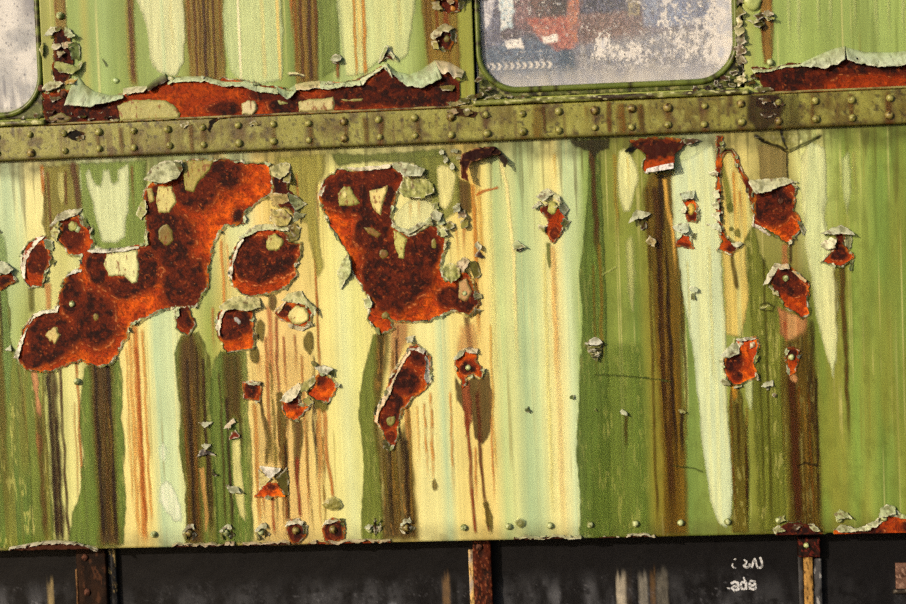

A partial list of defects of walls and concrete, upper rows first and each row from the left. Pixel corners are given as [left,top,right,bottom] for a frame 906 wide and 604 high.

peeling [20,44,465,122]
peeling [459,77,530,104]
peeling [692,0,906,91]
peeling [425,202,470,237]
corrosion [0,0,498,546]
corrosion [571,102,701,533]